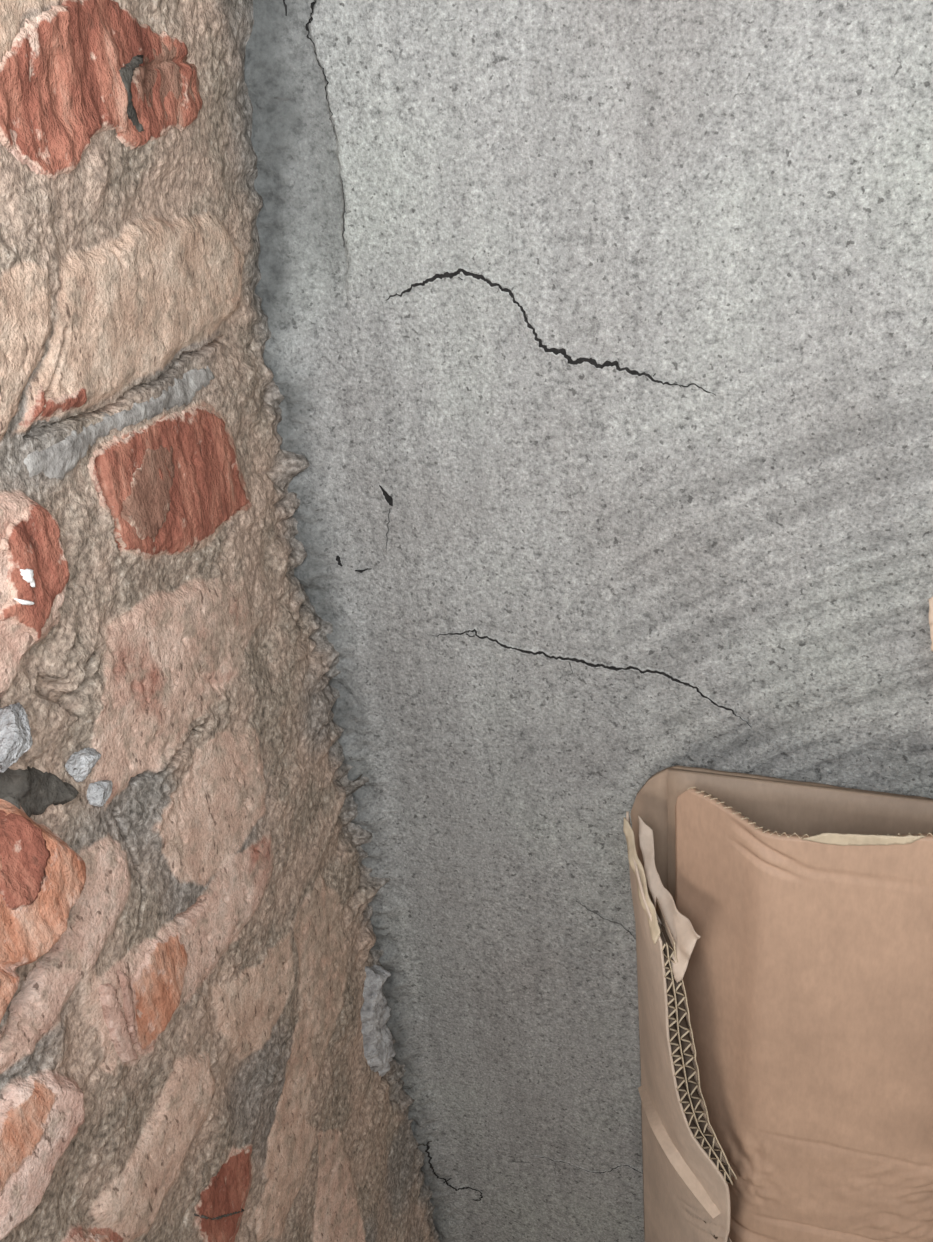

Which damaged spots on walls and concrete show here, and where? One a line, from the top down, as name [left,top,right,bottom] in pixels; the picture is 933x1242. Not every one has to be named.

crack [283,0,336,139]
crack [339,177,347,246]
crack [385,266,716,396]
crack [431,628,752,728]